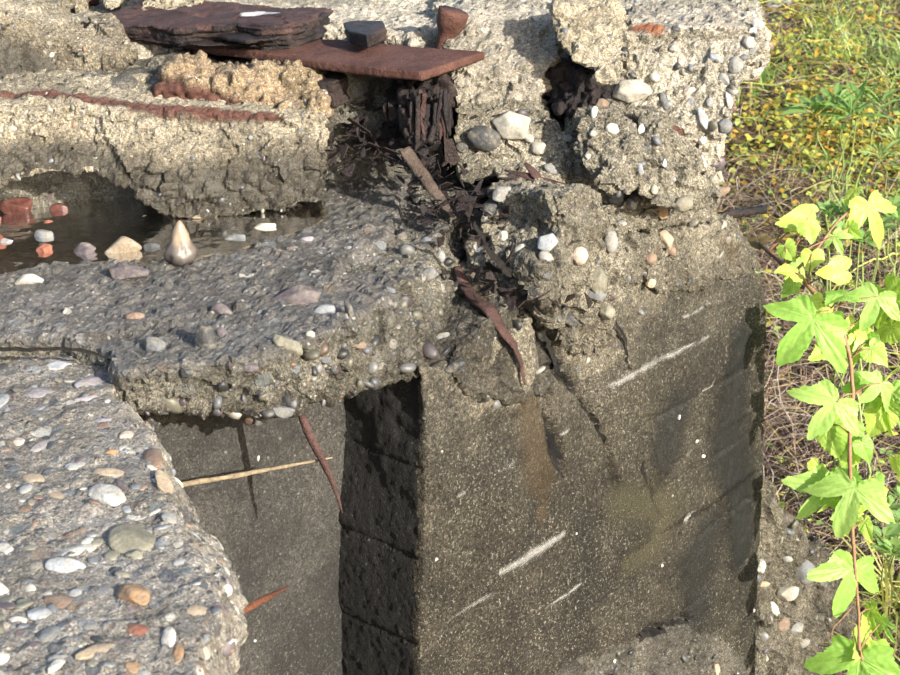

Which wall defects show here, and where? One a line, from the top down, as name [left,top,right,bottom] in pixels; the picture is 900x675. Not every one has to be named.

rust [0,79,282,121]
spalling [610,18,774,190]
crack [473,221,515,279]
spalling [674,219,754,275]
crack [0,347,111,361]
spalling [0,190,467,427]
spalling [484,262,671,393]
crack [615,320,632,370]
spalling [467,398,520,419]
crack [541,325,620,497]